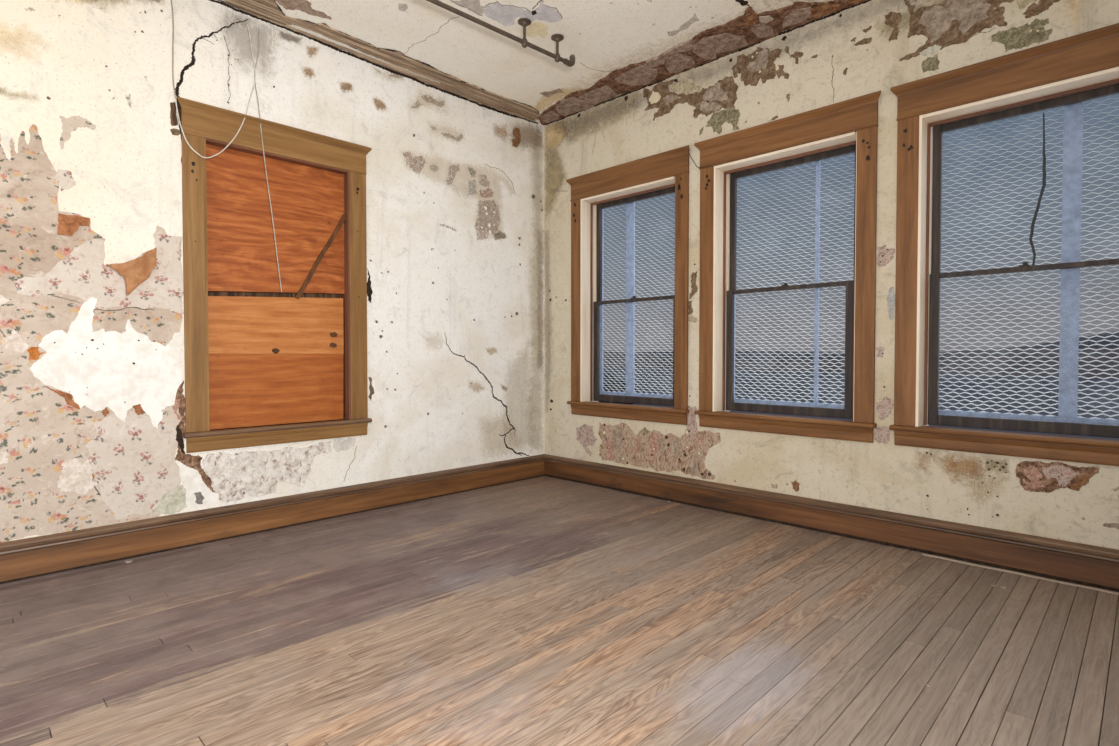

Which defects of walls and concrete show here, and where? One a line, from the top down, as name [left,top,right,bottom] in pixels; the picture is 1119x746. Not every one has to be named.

spalling [170,94,182,135]
crack [175,19,248,103]
peeling [275,0,332,20]
peeling [450,0,562,38]
peeling [643,46,817,135]
crack [735,0,749,8]
peeling [850,0,1060,72]
flaking render [403,152,521,246]
flaking render [27,297,219,515]
crack [445,336,529,456]
flaking render [576,424,597,456]
flaking render [1015,461,1100,493]